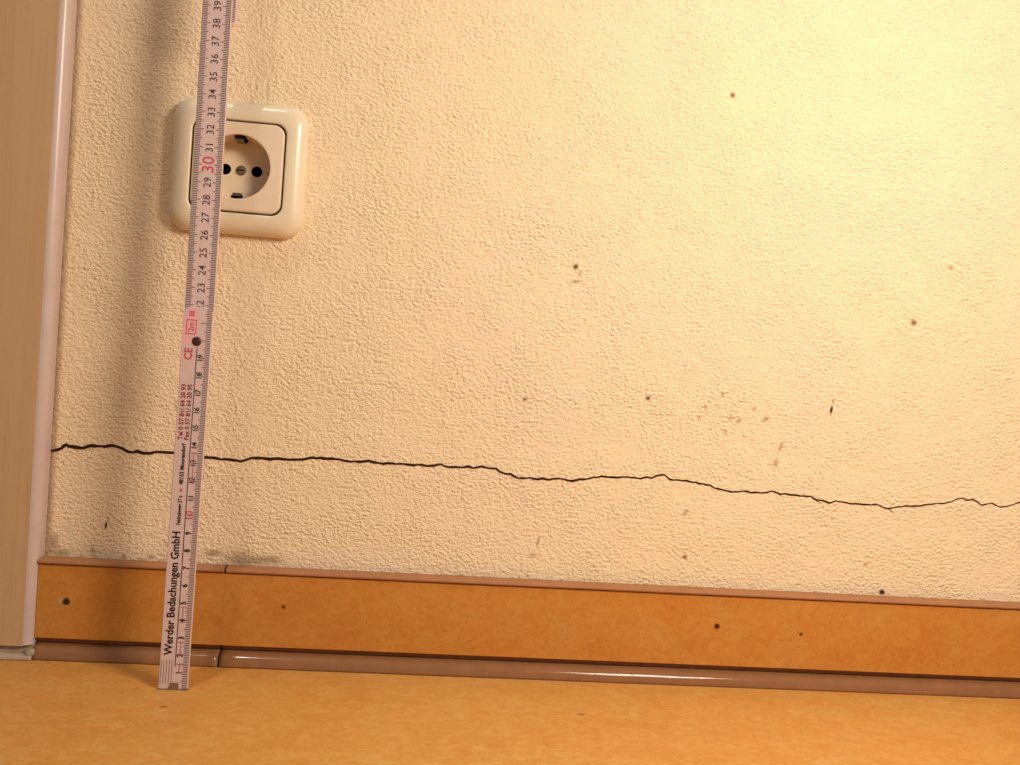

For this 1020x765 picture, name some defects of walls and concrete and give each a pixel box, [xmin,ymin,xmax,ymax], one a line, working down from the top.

crack [51,443,174,455]
crack [204,456,1020,512]